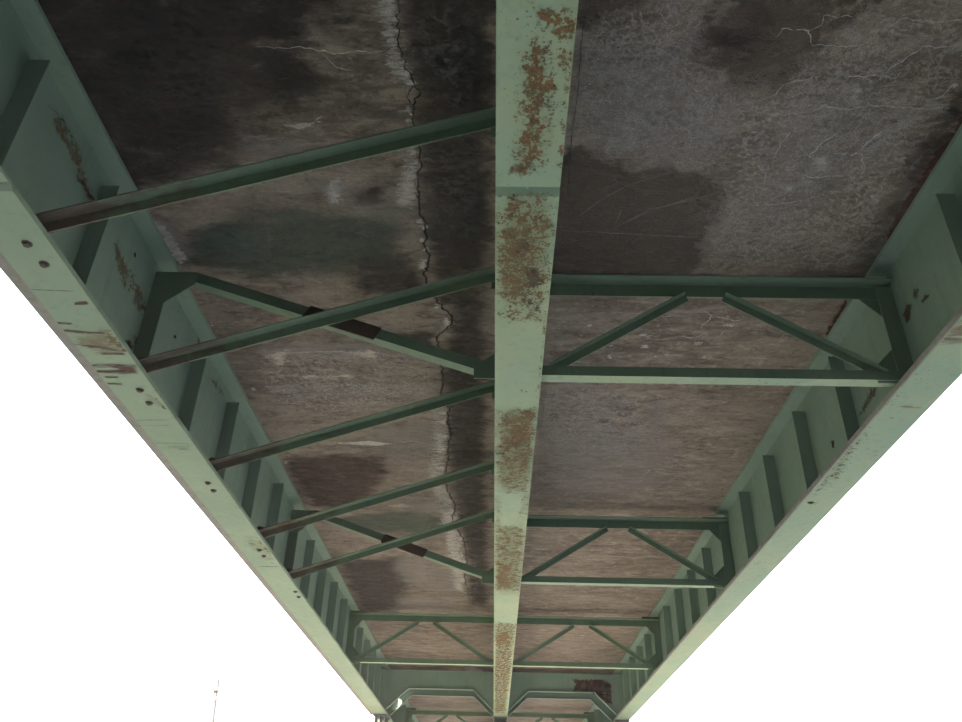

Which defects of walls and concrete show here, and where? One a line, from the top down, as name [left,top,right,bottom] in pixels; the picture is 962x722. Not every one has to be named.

water stain [38,0,491,186]
water stain [359,132,488,294]
crack [380,0,470,602]
rust [496,194,555,392]
rust [509,7,576,175]
water stain [552,0,962,277]
crack [780,14,868,48]
crack [752,76,952,232]
crack [846,18,962,79]
water stain [340,368,488,612]
rust [495,407,537,514]
rust [573,679,613,706]